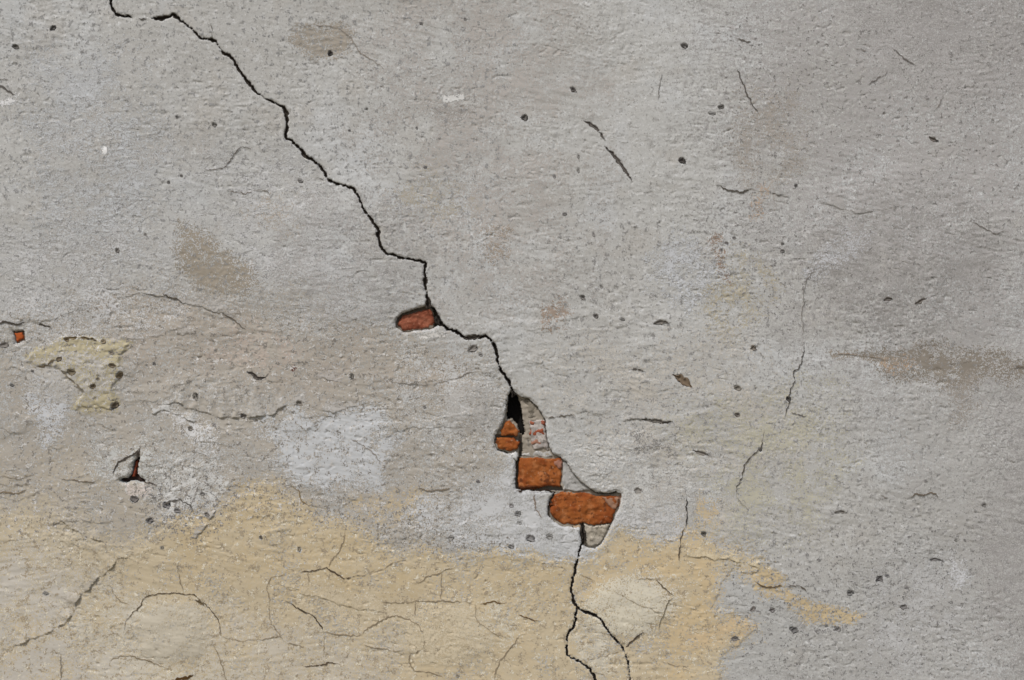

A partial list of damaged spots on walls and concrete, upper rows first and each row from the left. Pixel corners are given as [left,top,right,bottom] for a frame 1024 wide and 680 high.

crack [109,0,517,397]
spalling [64,336,123,379]
spalling [396,305,438,332]
crack [64,448,193,509]
peeling [0,390,622,680]
crack [111,530,538,680]
crack [516,489,554,519]
crack [565,526,674,680]